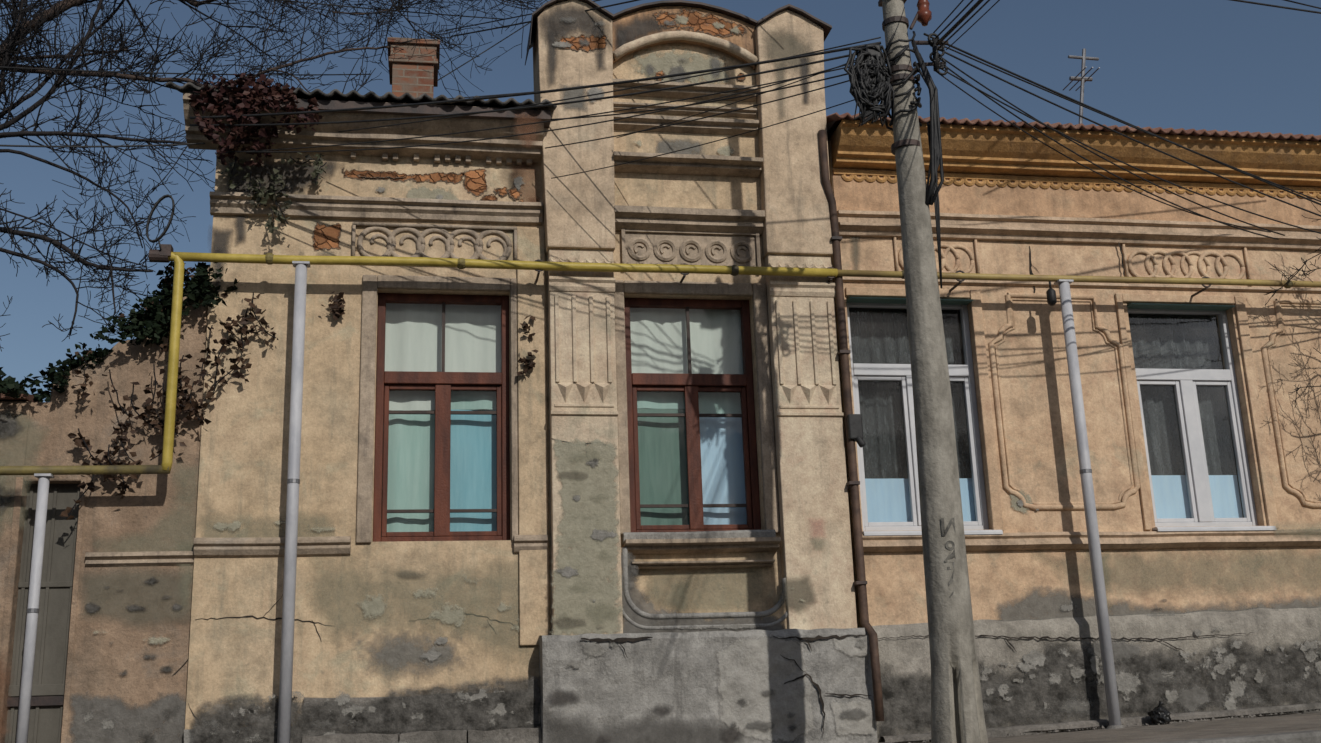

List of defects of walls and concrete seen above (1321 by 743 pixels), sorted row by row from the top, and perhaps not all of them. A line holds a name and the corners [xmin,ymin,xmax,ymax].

peeling [653,7,747,37]
flaking render [342,165,537,202]
flaking render [312,222,342,254]
peeling [552,439,638,635]
crack [172,598,331,716]
crack [773,635,929,738]
spalling [831,672,931,739]
crack [975,632,1252,652]
spalling [978,626,1321,728]